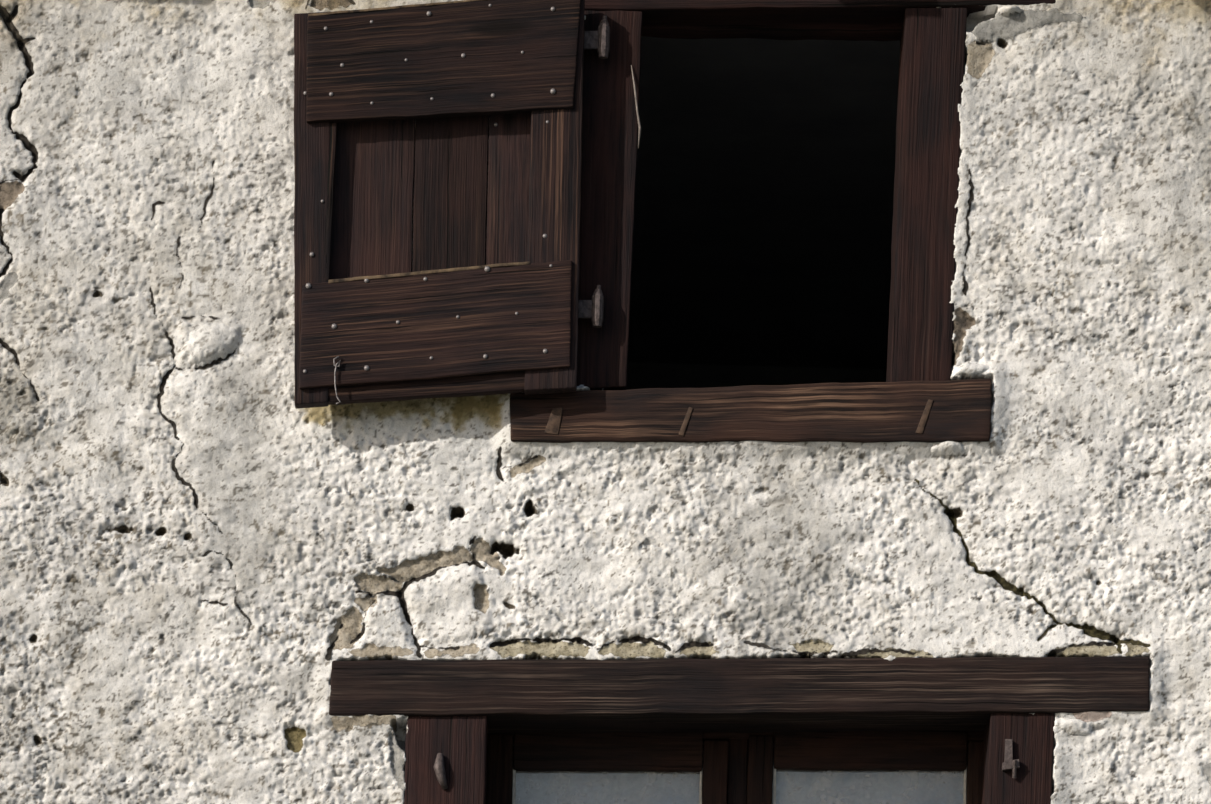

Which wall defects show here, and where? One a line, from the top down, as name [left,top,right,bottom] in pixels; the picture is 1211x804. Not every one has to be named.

flaking render [964,8,1086,79]
crack [0,5,38,277]
crack [0,338,39,401]
crack [149,160,252,625]
flaking render [329,538,719,660]
crack [914,479,1150,657]
crack [490,636,714,653]
flaking render [789,640,833,658]
crack [744,641,931,658]
flaking render [850,648,933,658]
flaking render [1046,642,1151,657]